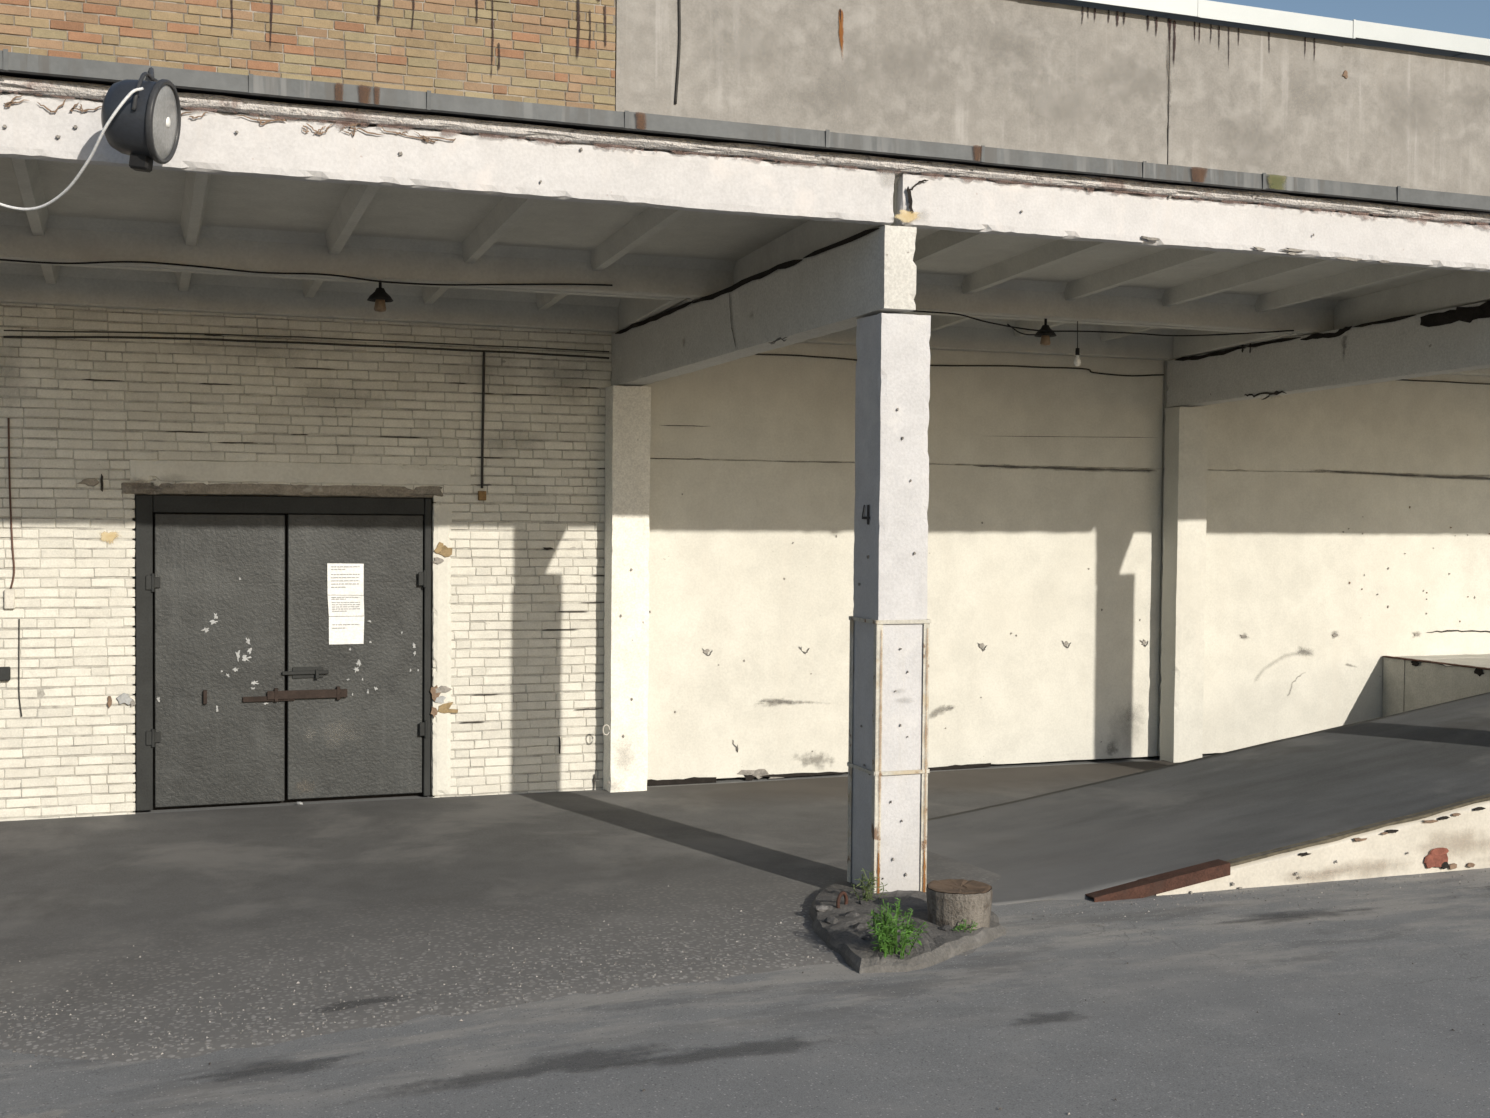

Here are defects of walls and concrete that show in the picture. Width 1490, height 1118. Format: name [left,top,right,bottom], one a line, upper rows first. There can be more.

leakage [1082,6,1125,26]
leakage [1147,15,1176,61]
leakage [1194,22,1240,66]
crack [615,179,928,347]
crack [1175,315,1415,361]
spalling [1422,807,1486,823]
spalling [1406,847,1475,869]